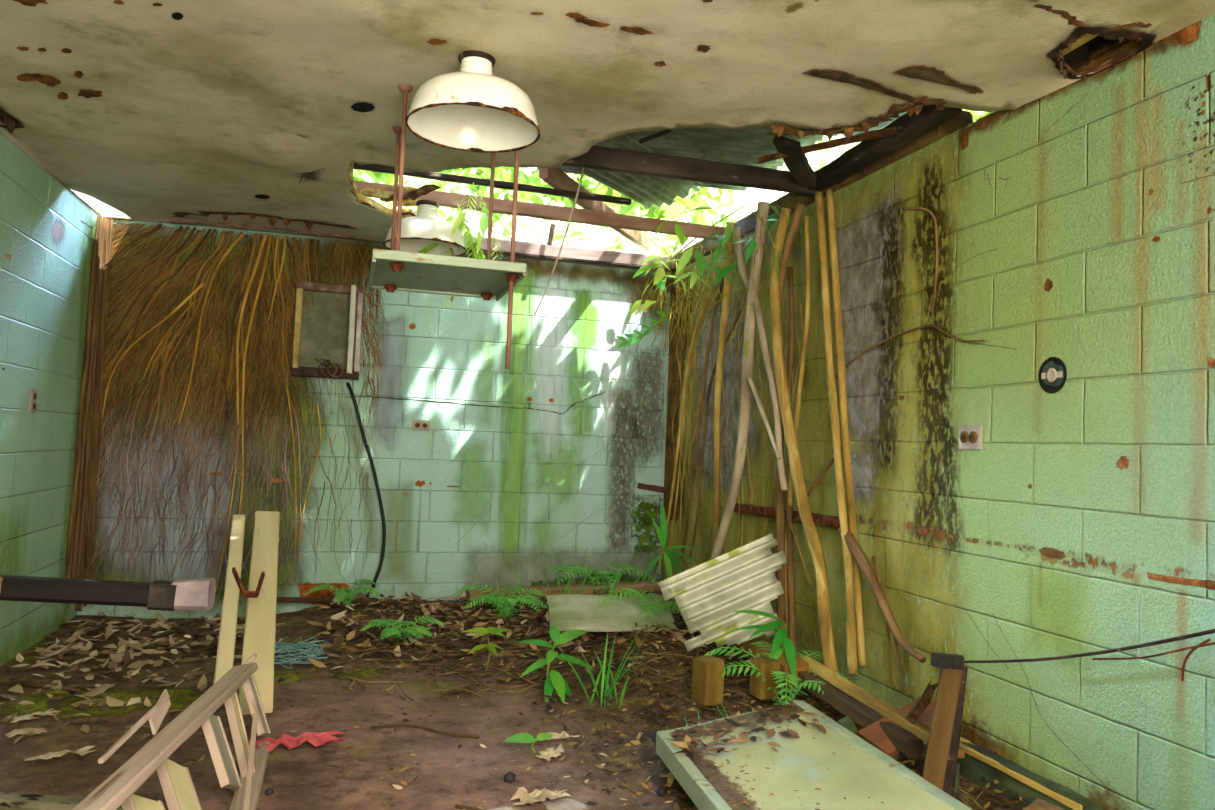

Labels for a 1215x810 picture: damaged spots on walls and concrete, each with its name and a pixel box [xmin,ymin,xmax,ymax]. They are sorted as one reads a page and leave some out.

mould [876,164,960,551]
corrosion [733,503,888,529]
corrosion [904,522,1215,590]